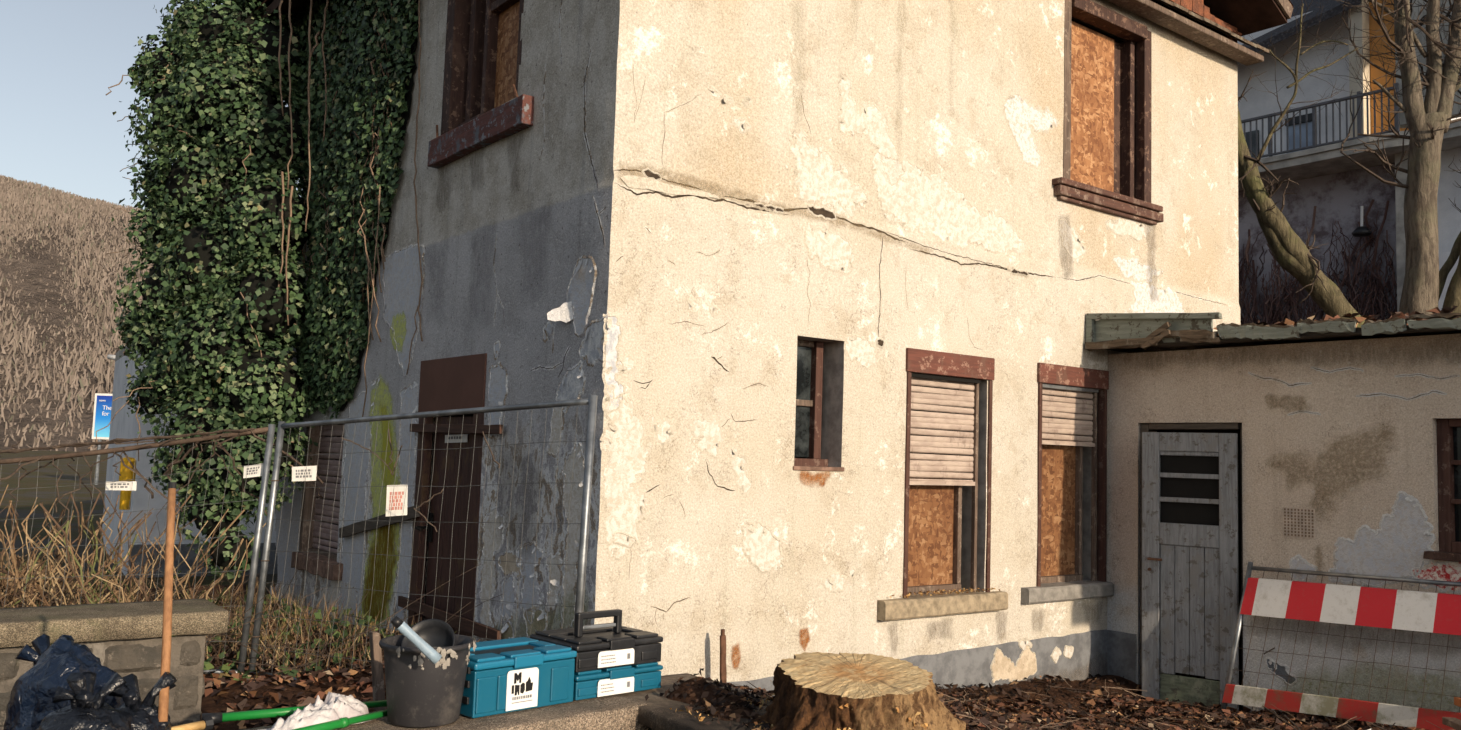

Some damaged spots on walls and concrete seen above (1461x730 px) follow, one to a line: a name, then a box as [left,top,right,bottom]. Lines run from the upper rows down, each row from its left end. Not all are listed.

peeling [1003,92,1059,169]
crack [583,48,1228,351]
crack [668,320,768,428]
peeling [479,255,753,642]
damp [359,380,400,628]
peeling [741,520,785,575]
peeling [1289,491,1461,594]
flaking render [990,637,1074,683]